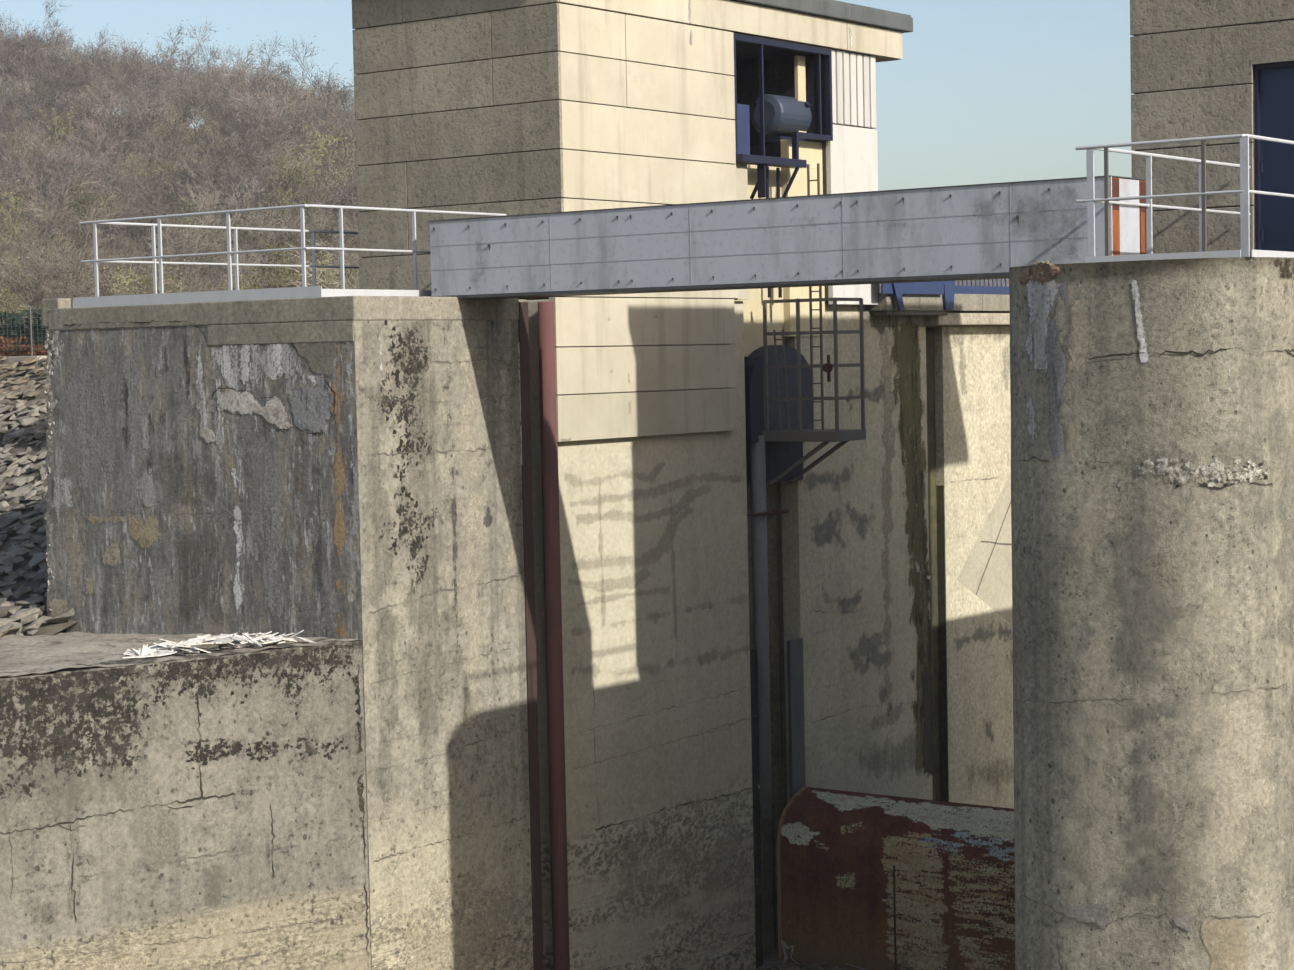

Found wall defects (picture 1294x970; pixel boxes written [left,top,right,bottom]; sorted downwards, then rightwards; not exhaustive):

efflorescence [1018,279,1061,372]
efflorescence [1131,280,1149,363]
crack [1086,347,1294,360]
peeling [217,386,333,433]
peeling [199,426,216,443]
spalling [1137,455,1274,488]
water stain [918,508,936,775]
crack [1019,684,1286,719]
crack [0,645,526,966]